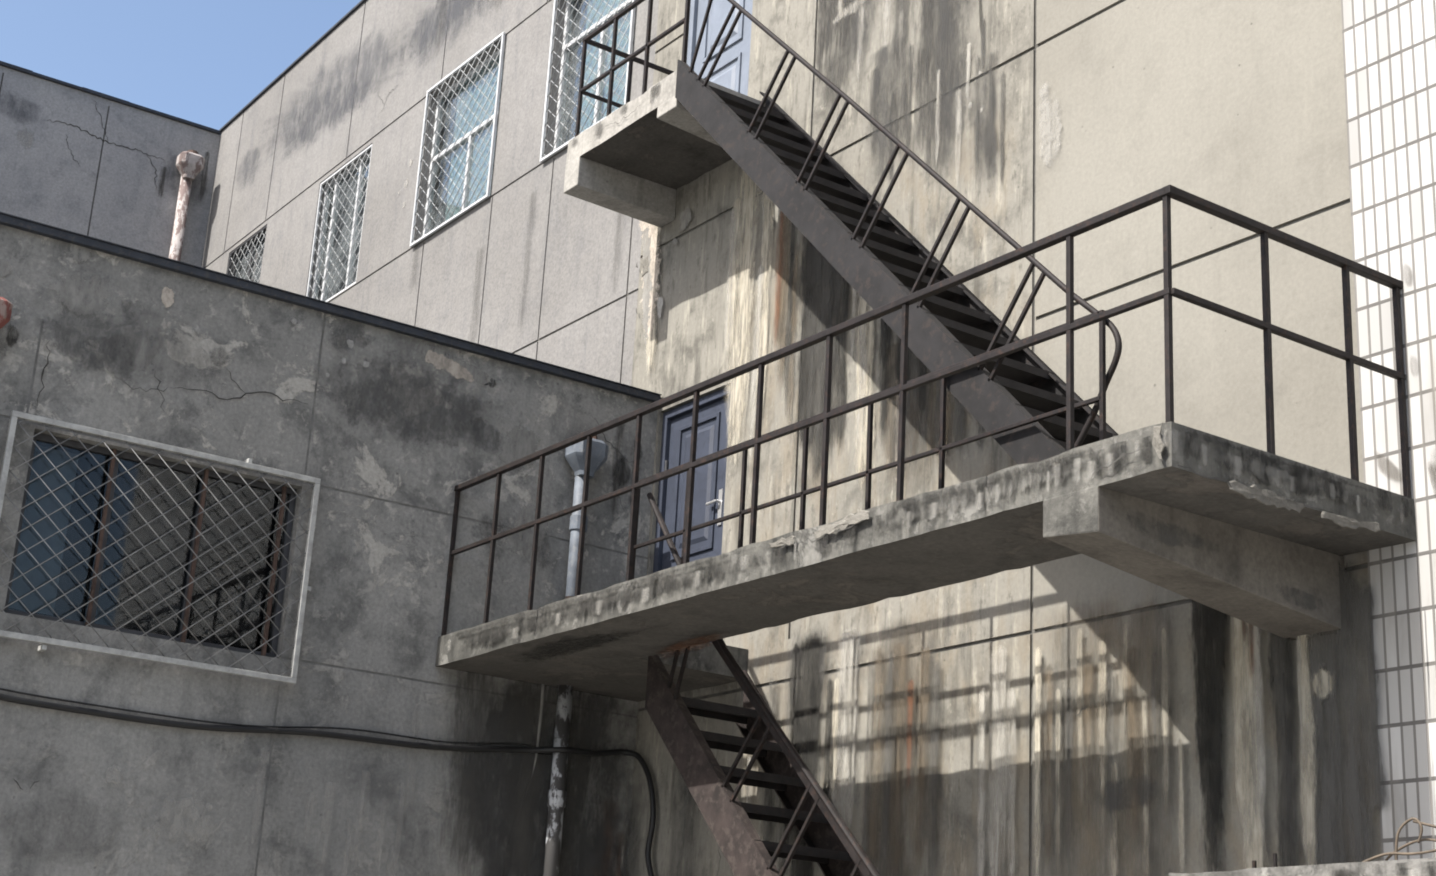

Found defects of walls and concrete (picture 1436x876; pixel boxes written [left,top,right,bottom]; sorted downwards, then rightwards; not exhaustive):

crack [47,101,163,188]
damp [817,0,1004,184]
crack [113,369,306,411]
damp [453,671,635,876]
damp [770,631,856,813]
damp [978,648,1014,876]
damp [1034,648,1060,874]
damp [1077,628,1117,876]
damp [1123,600,1332,876]